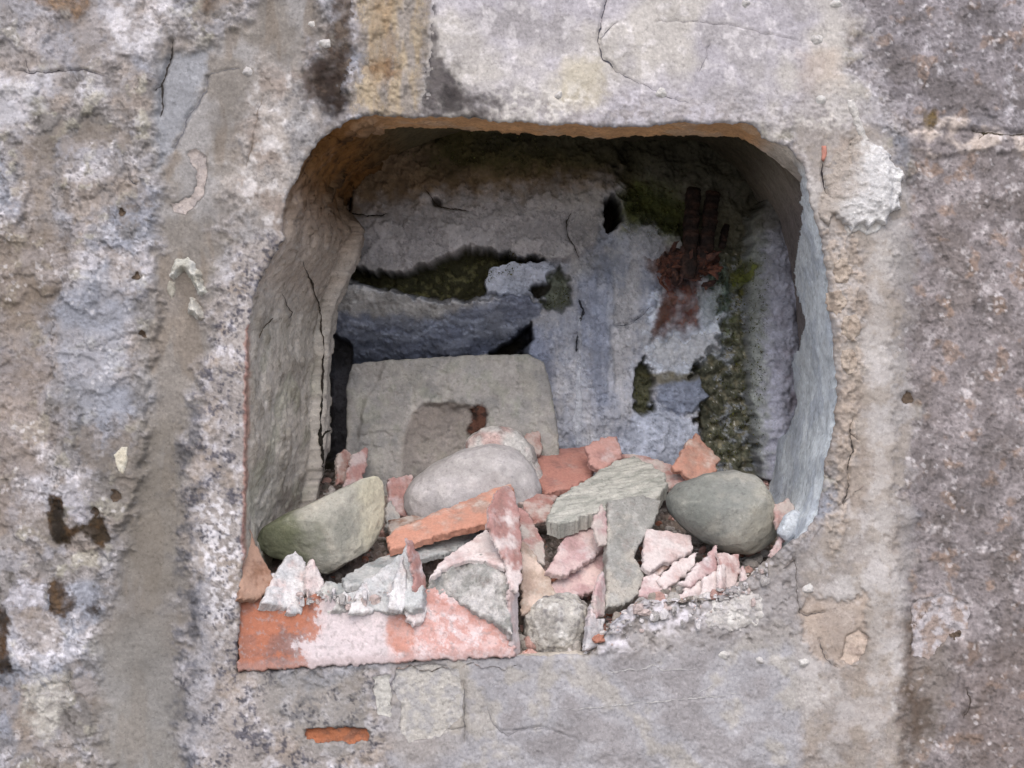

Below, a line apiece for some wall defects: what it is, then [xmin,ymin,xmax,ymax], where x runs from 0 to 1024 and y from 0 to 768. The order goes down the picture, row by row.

crack [155,46,239,151]
crack [597,0,691,104]
rust [649,241,723,337]
crack [303,262,331,480]
peeling [334,447,368,487]
peeling [638,545,748,599]
peeling [768,498,795,558]